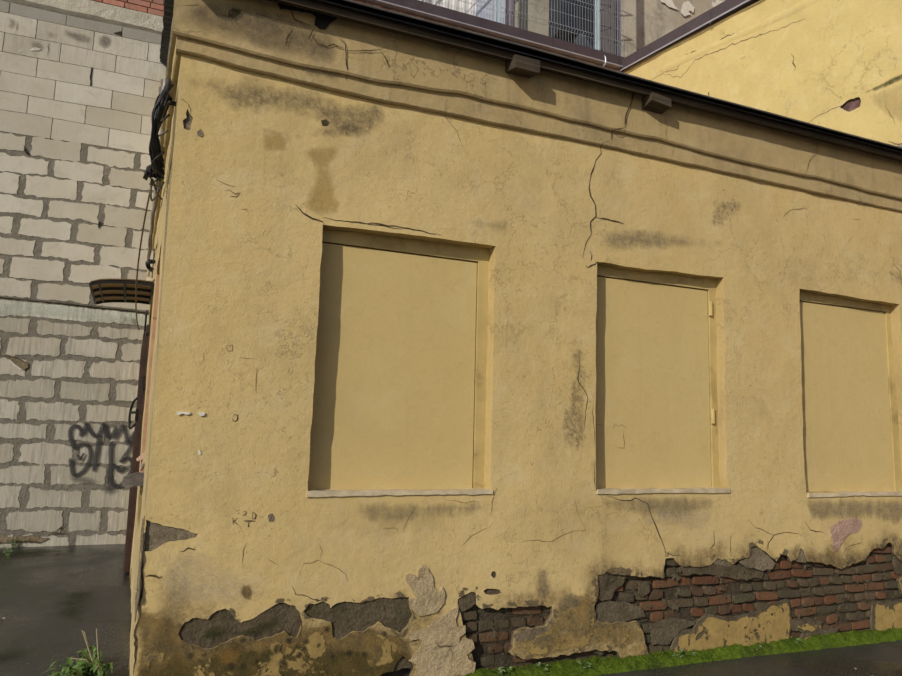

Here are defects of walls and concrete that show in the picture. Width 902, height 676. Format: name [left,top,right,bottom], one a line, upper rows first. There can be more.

crack [285,6,389,79]
flaking render [661,0,694,16]
crack [653,18,805,79]
flaking render [842,98,861,112]
crack [295,204,440,235]
crack [583,93,635,268]
crack [578,363,680,556]
flaking render [134,516,197,623]
flaking render [591,517,902,656]
crack [748,519,824,552]
flaking render [179,587,416,676]
flaking render [453,587,621,670]